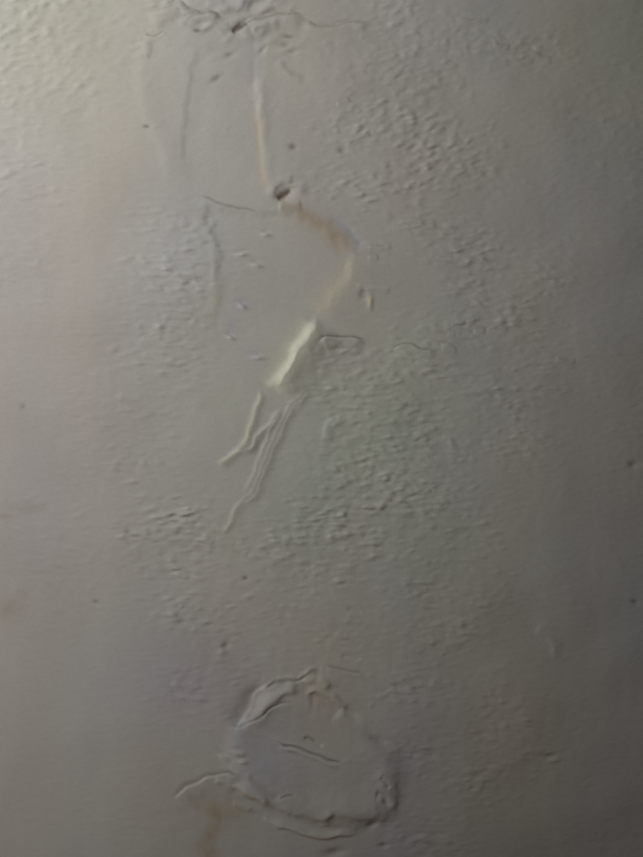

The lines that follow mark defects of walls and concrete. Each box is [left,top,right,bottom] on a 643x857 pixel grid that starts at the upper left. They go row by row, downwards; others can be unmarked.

crack [135,0,380,40]